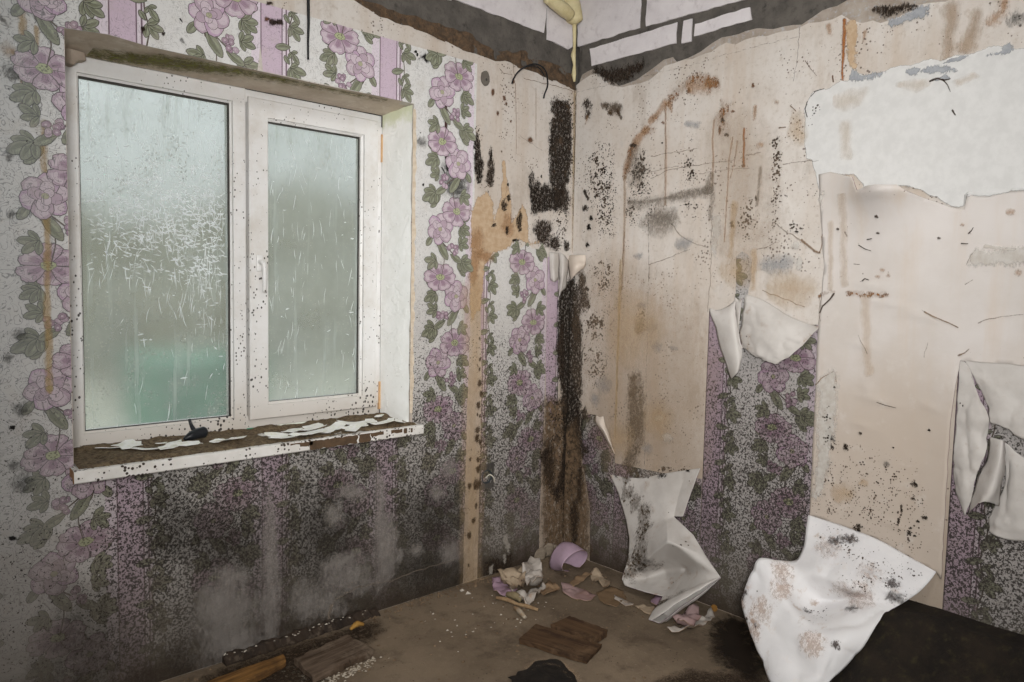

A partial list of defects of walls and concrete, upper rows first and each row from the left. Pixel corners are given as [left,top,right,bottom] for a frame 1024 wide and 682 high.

spalling [355,0,948,91]
peeling [804,42,1024,207]
leakage [440,94,655,320]
leakage [675,158,711,218]
peeling [709,294,819,379]
spalling [290,428,413,450]
leakage [540,259,615,554]
leakage [813,435,932,556]
leakage [204,622,387,682]